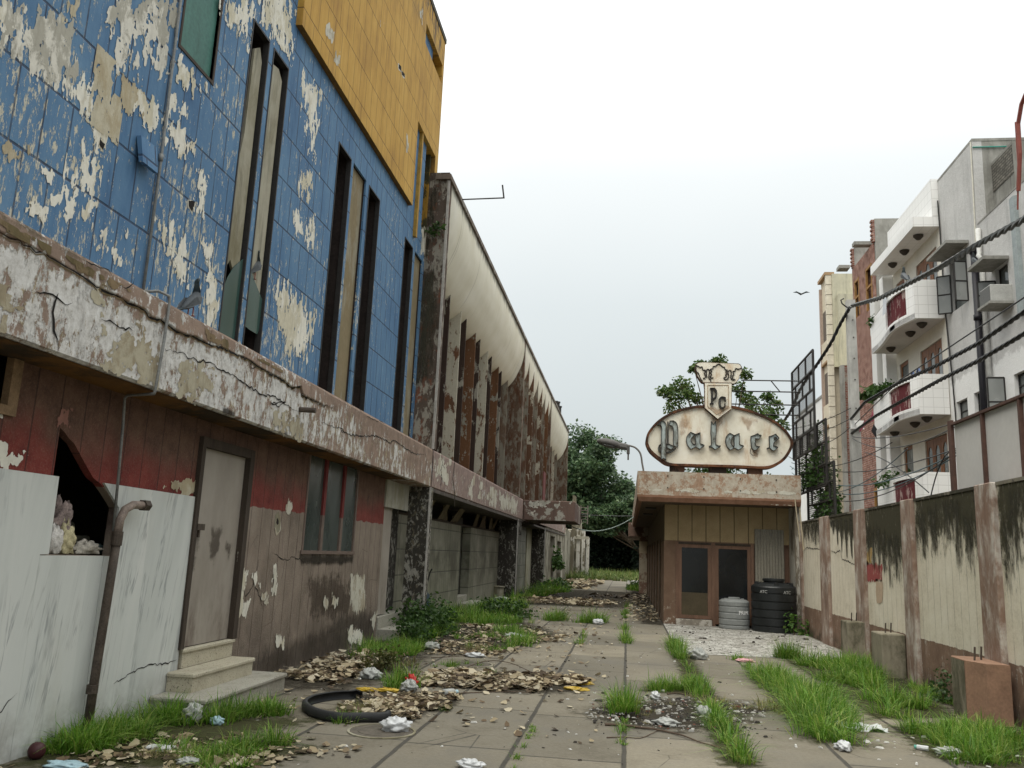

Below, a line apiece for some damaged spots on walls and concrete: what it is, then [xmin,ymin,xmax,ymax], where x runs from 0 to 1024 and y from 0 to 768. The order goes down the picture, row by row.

peeling [0,0,209,267]
peeling [219,0,323,249]
crack [0,233,445,481]
peeling [250,263,317,373]
peeling [0,440,26,469]
peeling [468,474,572,515]
leakage [802,504,902,583]
leakage [914,490,978,566]
leakage [997,480,1024,580]
peeling [237,557,278,619]
peeling [323,573,378,645]
crack [116,660,175,682]